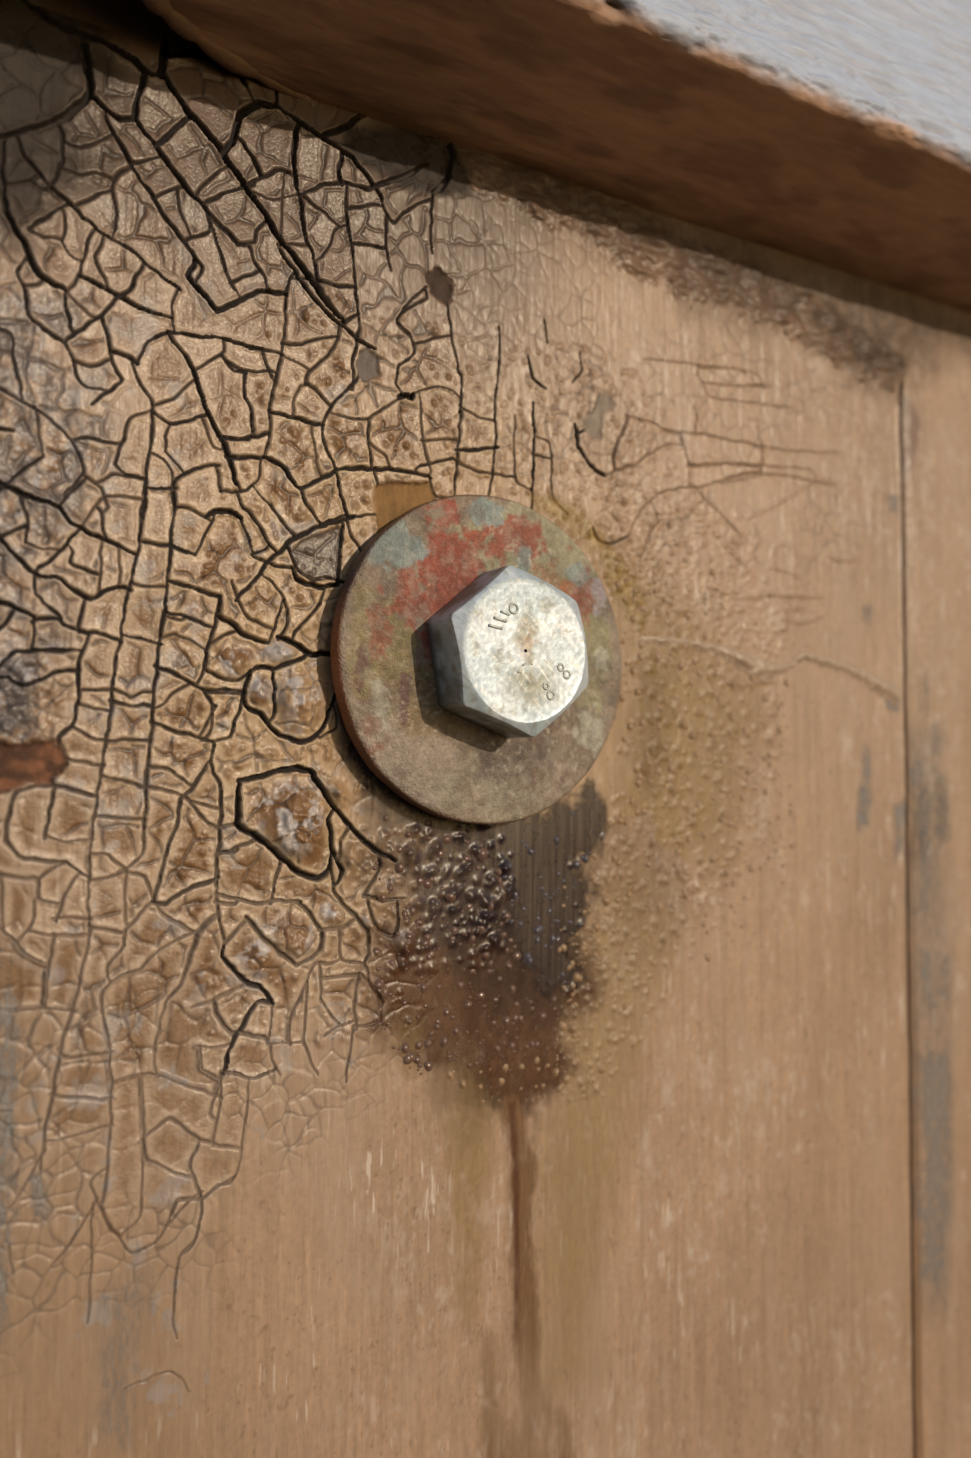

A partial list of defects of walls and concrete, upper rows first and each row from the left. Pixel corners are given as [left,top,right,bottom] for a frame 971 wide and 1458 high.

peeling [289,525,341,579]
corrosion [531,494,646,633]
crack [0,34,841,1339]
corrosion [339,710,606,1348]
crack [124,1370,189,1392]